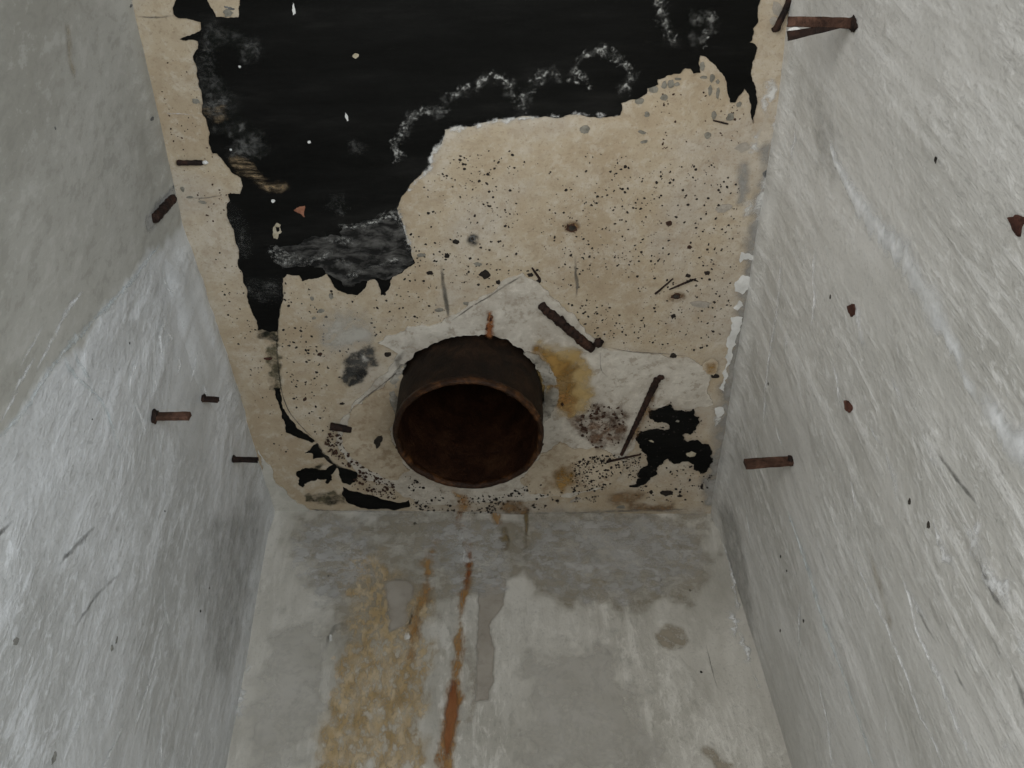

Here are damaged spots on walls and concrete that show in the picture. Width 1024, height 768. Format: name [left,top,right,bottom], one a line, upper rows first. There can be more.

spalling [635,78,681,117]
spalling [700,62,742,121]
corrosion [146,190,177,230]
corrosion [1007,215,1024,237]
corrosion [533,302,604,418]
peeling [702,252,753,391]
corrosion [620,375,665,456]
peeling [306,443,358,505]
leakage [303,290,748,643]
corrosion [435,493,473,768]